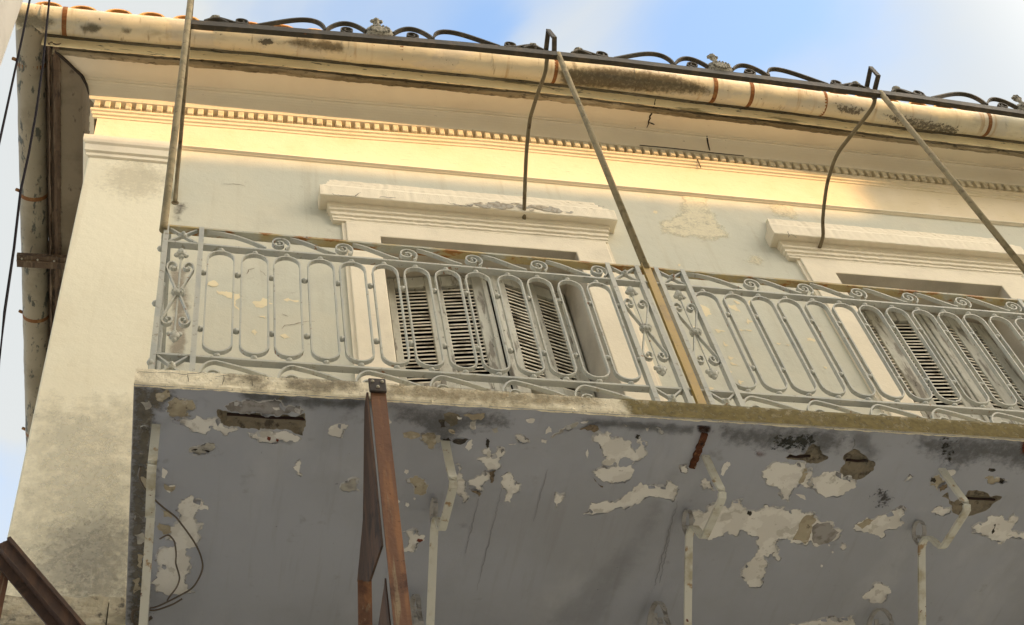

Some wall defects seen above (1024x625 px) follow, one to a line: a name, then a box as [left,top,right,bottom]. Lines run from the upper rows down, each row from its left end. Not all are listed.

spalling [140,390,306,456]
peeling [403,412,688,516]
rust [689,426,711,469]
mould [772,434,816,451]
peeling [133,467,209,595]
peeling [691,444,907,588]
peeling [930,468,1024,544]